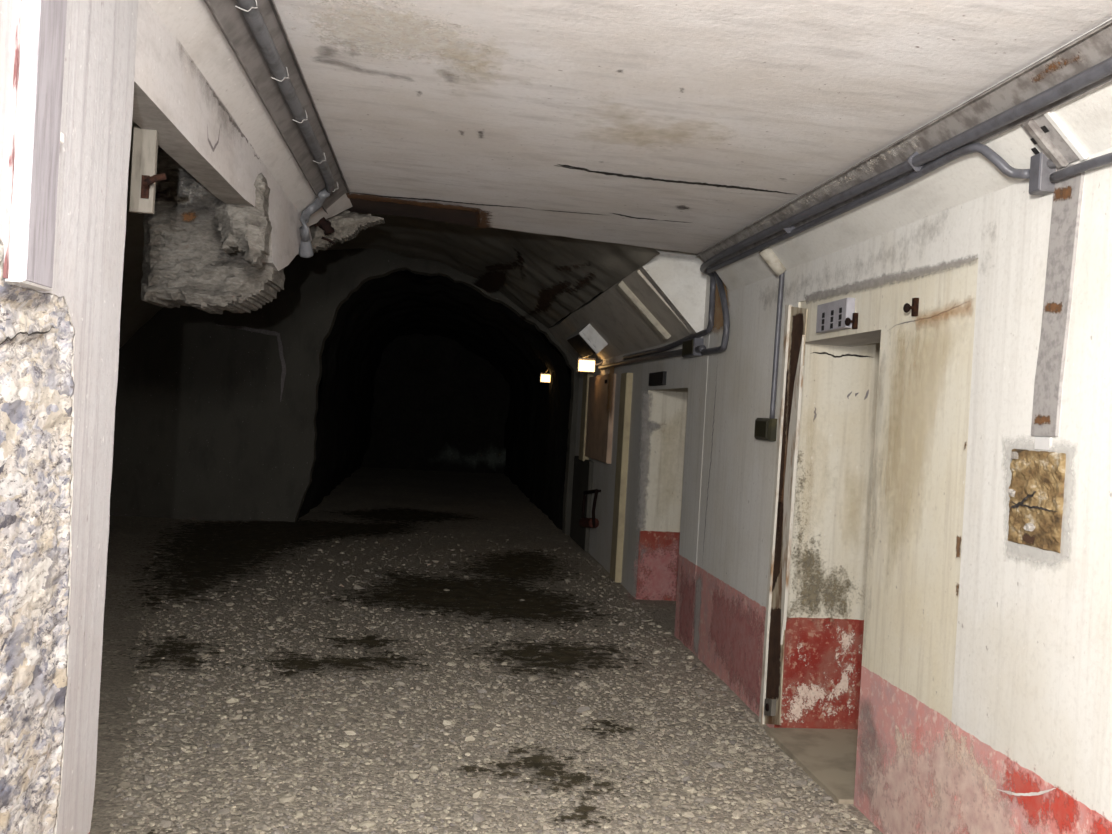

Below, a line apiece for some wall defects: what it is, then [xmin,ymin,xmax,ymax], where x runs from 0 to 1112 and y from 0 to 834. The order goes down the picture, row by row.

crack [554,164,797,195]
spalling [141,145,285,314]
spalling [309,210,385,253]
rust [520,262,596,321]
spalling [0,248,75,834]
mould [787,534,851,618]
peeling [781,625,861,723]